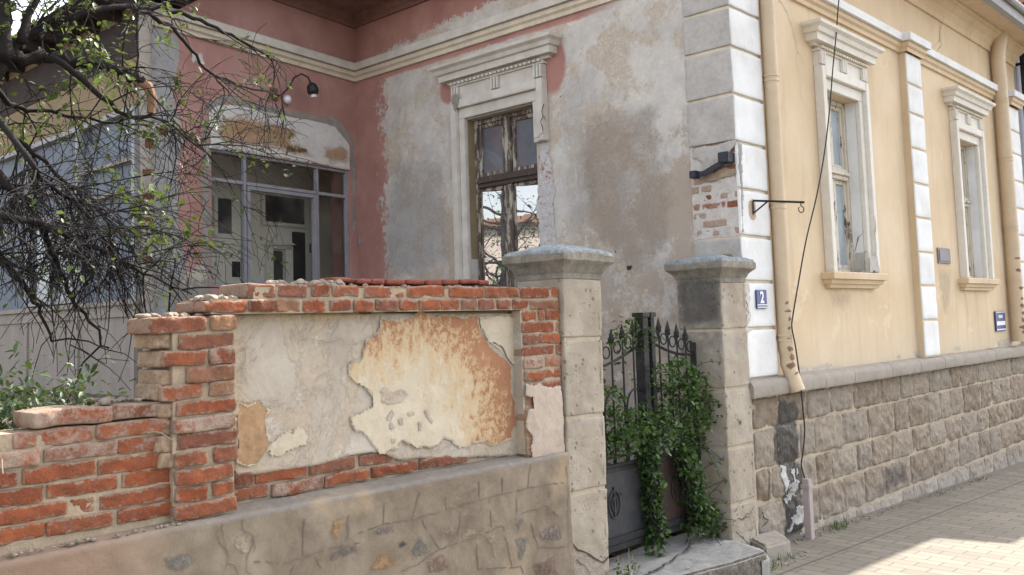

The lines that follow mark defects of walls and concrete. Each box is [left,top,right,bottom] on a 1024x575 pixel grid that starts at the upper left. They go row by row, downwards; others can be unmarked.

flaking render [690,140,744,240]
flaking render [234,399,309,467]
flaking render [348,312,516,455]
damp [773,401,804,538]
rust [785,301,799,375]